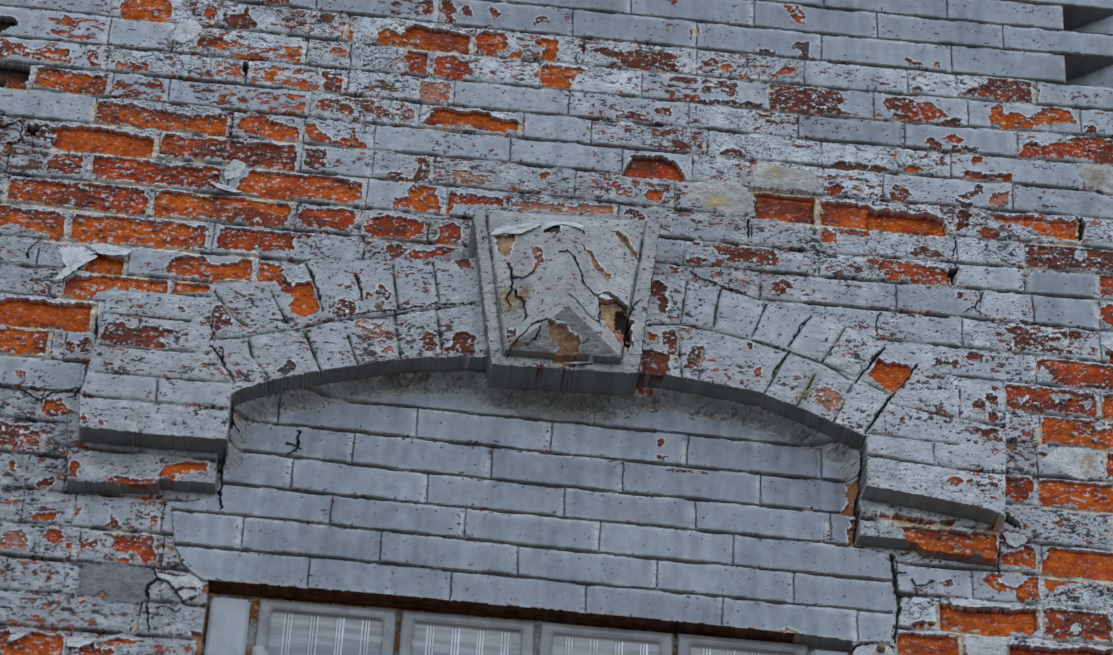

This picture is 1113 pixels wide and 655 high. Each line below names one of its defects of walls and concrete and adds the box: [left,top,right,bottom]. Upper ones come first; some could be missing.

peeling [0,0,856,397]
crack [306,261,476,317]
crack [507,249,643,358]
crack [752,321,817,378]
crack [855,312,887,384]
spalling [749,76,1113,655]
peeling [0,421,81,477]
peeling [109,460,210,495]
peeling [30,507,160,564]
crack [995,540,1003,573]
crack [848,553,936,655]
peeling [0,620,141,655]